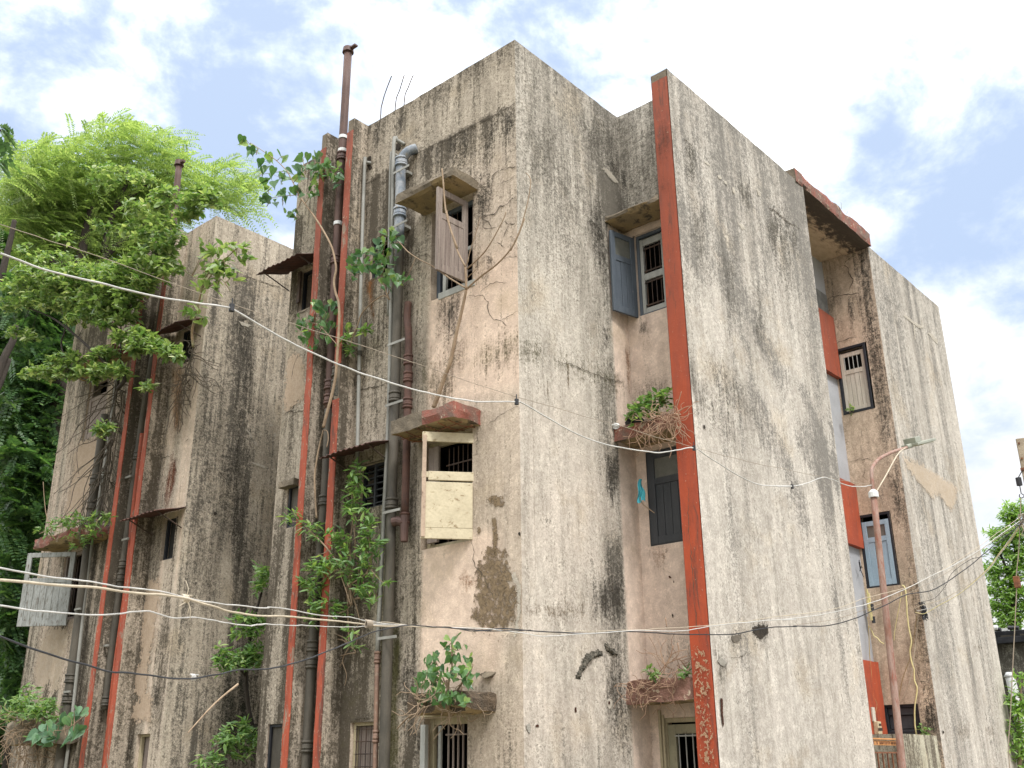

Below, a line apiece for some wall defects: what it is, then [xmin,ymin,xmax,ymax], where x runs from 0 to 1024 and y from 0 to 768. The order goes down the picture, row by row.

crack [469,166,517,325]
water stain [606,455,618,501]
water stain [593,539,624,622]
peeling [691,646,728,765]